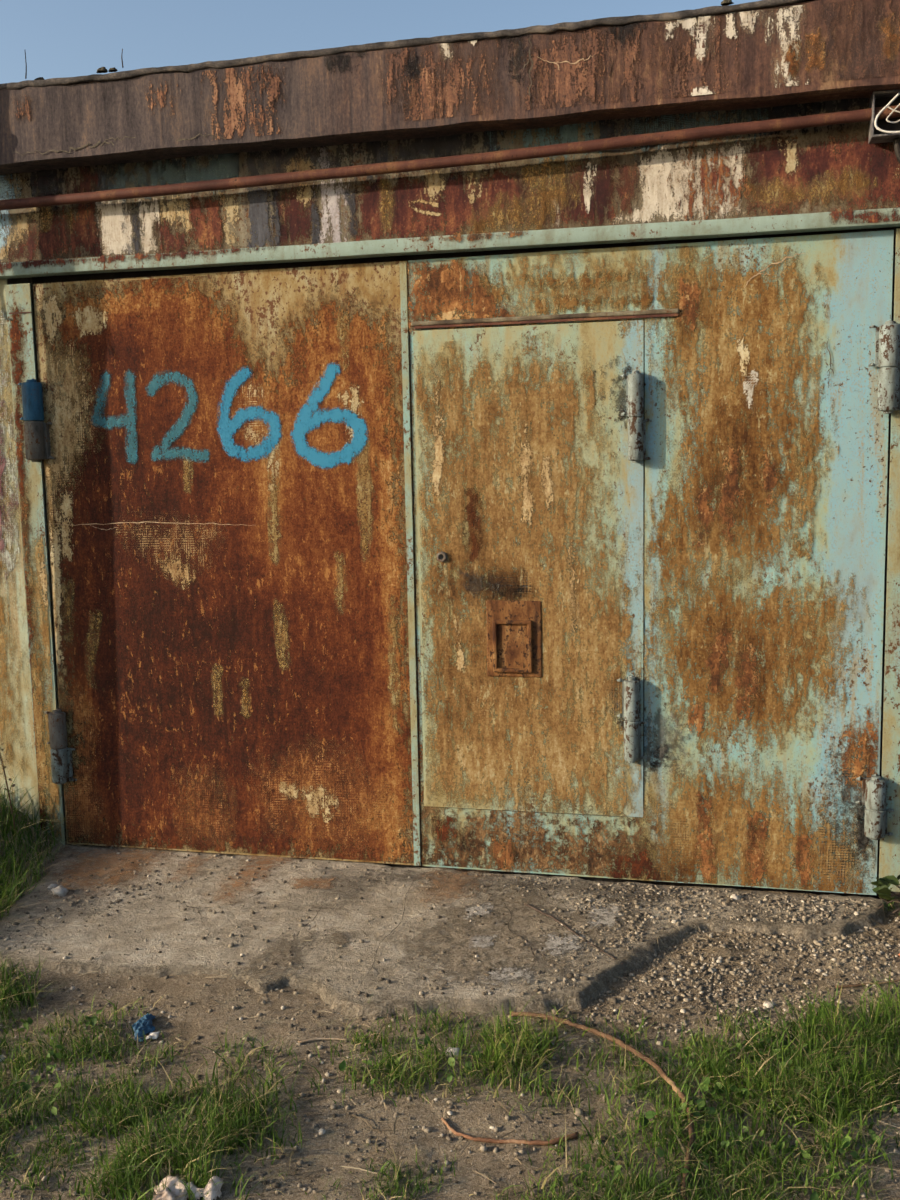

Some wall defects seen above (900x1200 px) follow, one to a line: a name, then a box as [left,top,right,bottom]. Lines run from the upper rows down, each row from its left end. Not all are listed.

corrosion [200,65,286,140]
corrosion [378,16,742,121]
corrosion [794,0,900,84]
peeling [0,173,22,262]
corrosion [0,166,321,274]
peeling [95,190,242,256]
corrosion [350,154,621,243]
peeling [609,124,766,224]
corrosion [736,126,900,224]
peeling [736,337,759,410]
corrosion [0,243,879,906]